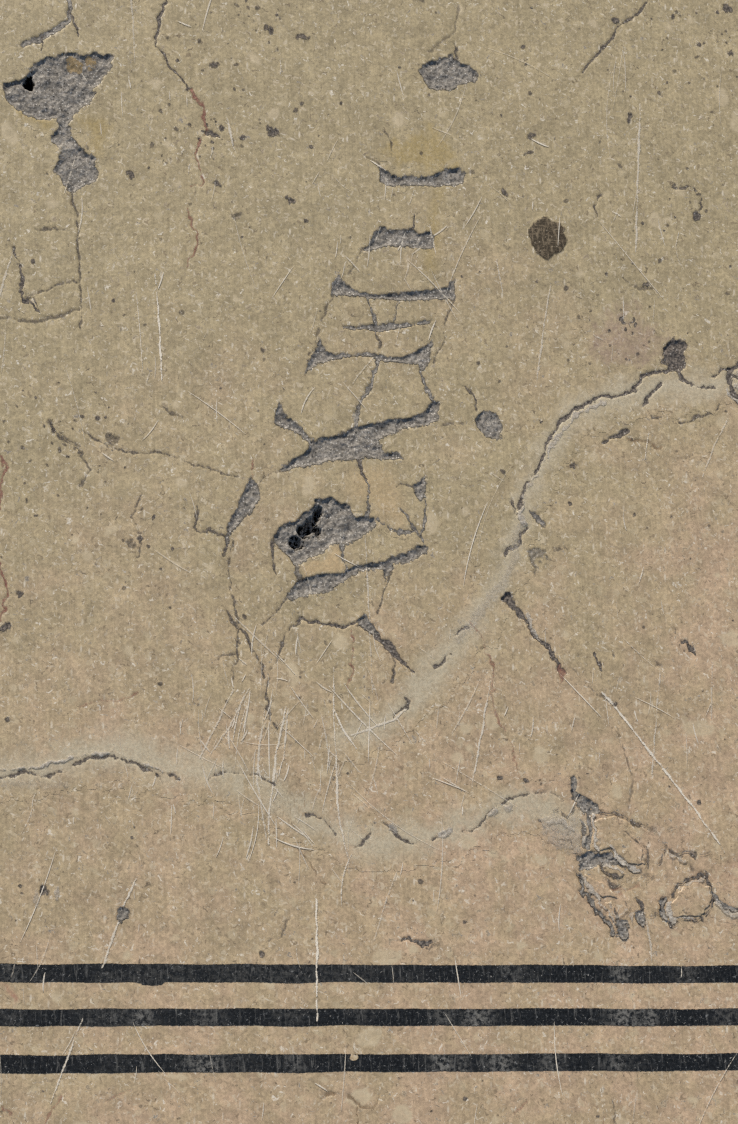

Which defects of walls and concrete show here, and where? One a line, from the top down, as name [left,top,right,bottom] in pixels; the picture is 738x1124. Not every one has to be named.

spalling [418,46,481,91]
spalling [2,51,114,192]
crack [154,0,220,266]
spalling [377,166,466,187]
crack [0,192,82,328]
spalling [330,274,456,331]
spalling [363,214,435,251]
leakage [528,216,567,259]
spalling [270,338,503,601]
crack [503,337,718,557]
crack [501,592,567,681]
crack [0,751,180,780]